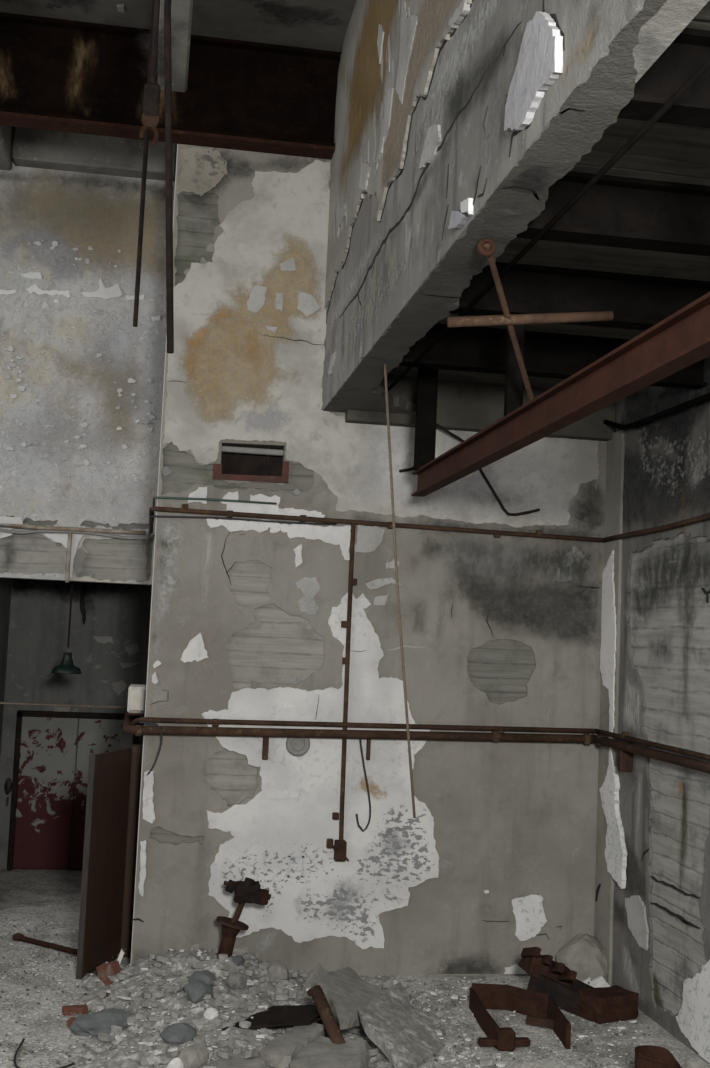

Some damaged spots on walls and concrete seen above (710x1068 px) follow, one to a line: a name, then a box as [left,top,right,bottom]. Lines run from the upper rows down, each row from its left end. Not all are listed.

leakage [342,0,455,183]
crack [259,0,565,345]
leakage [418,0,505,127]
peeling [0,272,145,303]
leakage [184,237,317,430]
peeling [114,0,600,615]
spalling [0,516,154,583]
peeling [138,559,439,949]
spalling [467,639,535,705]
spalling [599,532,710,1063]
peeling [511,894,547,941]